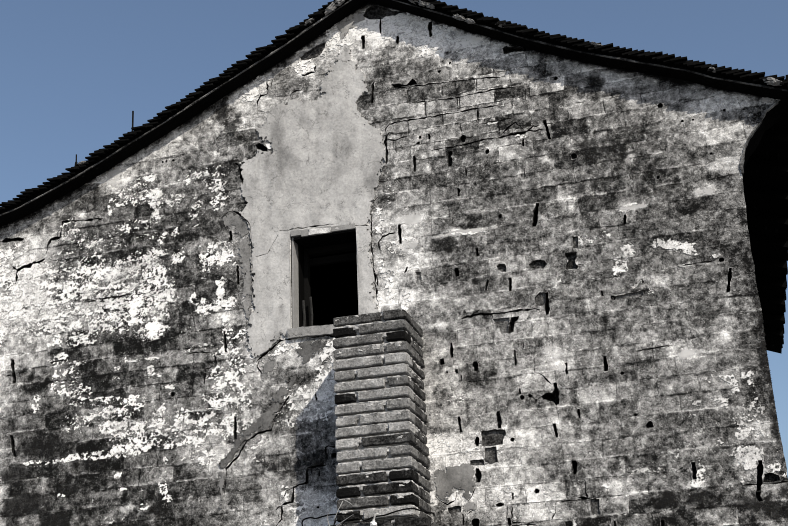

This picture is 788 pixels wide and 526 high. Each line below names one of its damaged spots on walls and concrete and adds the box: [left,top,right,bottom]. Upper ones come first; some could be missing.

crack [12,218,103,284]
damp [433,218,497,252]
peeling [651,238,699,256]
crack [256,335,333,374]
peeling [276,338,336,428]
damp [759,333,782,449]
damp [0,437,104,526]
peeling [158,481,172,505]
crack [224,390,295,494]
crack [276,445,335,526]
spalling [428,429,515,477]
damp [648,487,788,522]